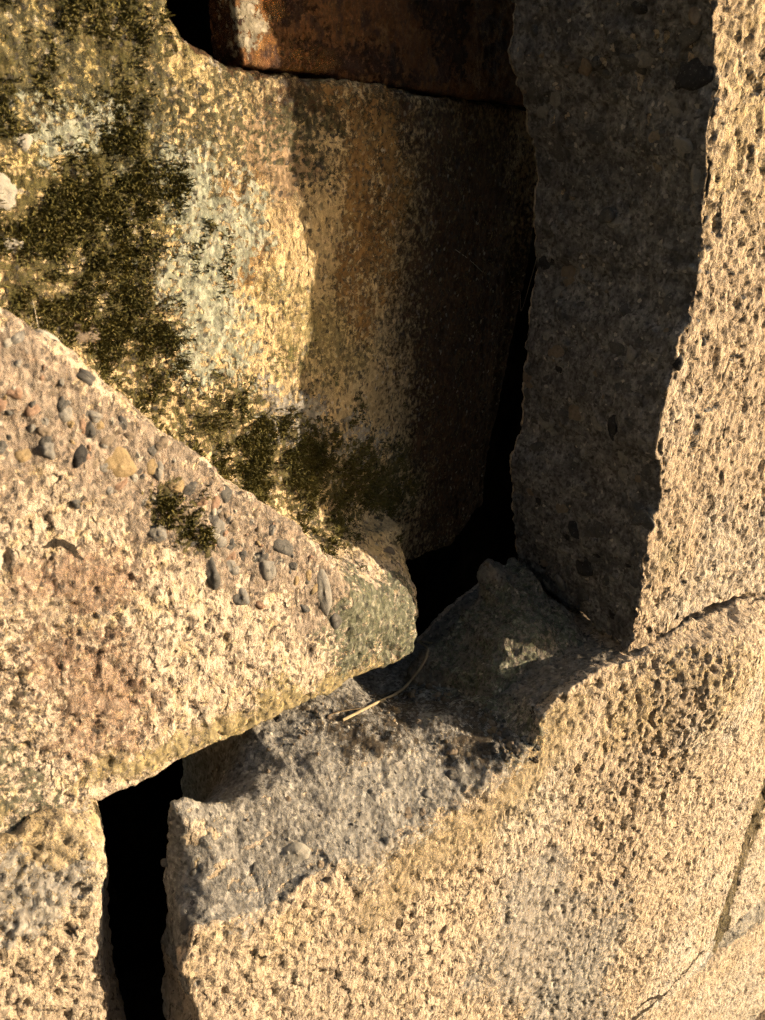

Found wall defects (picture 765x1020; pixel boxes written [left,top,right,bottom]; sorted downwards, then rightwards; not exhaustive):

rust [168,0,537,560]
water stain [252,373,403,469]
crack [632,951,704,1020]